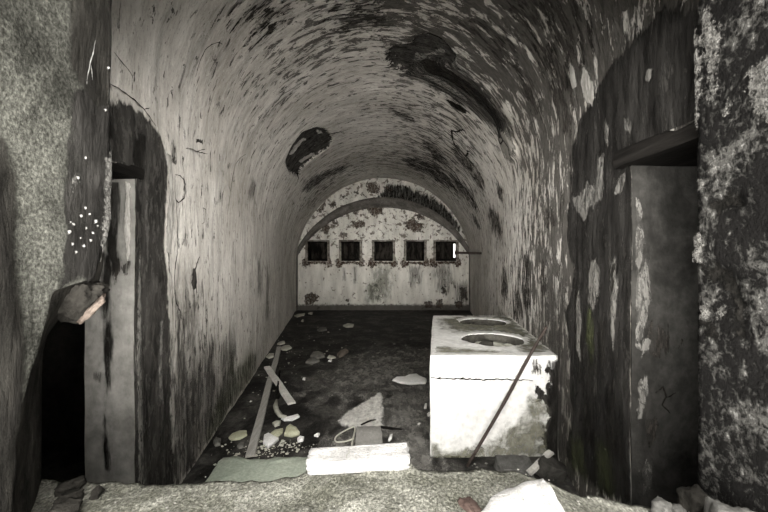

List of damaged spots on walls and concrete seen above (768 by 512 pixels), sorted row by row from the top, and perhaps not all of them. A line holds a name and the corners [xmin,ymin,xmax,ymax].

flaking render [285,127,346,192]
water stain [378,183,463,233]
water stain [367,268,388,302]
water stain [435,266,467,302]
flaking render [459,0,729,505]
water stain [539,277,621,494]